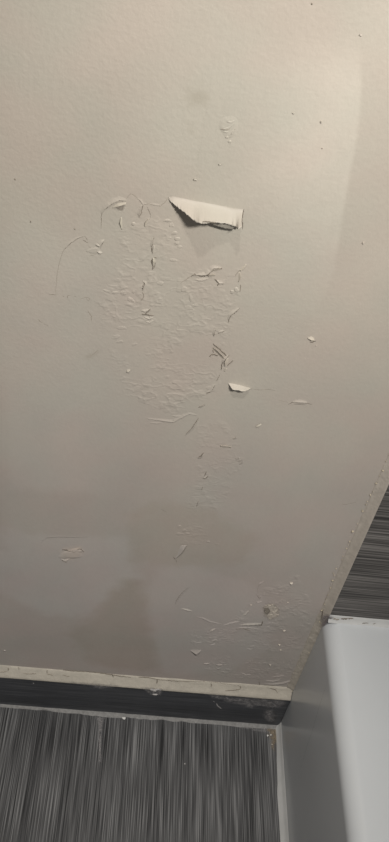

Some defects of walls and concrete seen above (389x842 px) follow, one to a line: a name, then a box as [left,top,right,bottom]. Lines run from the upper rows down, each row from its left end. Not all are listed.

peeling [168,196,244,230]
peeling [228,383,275,391]